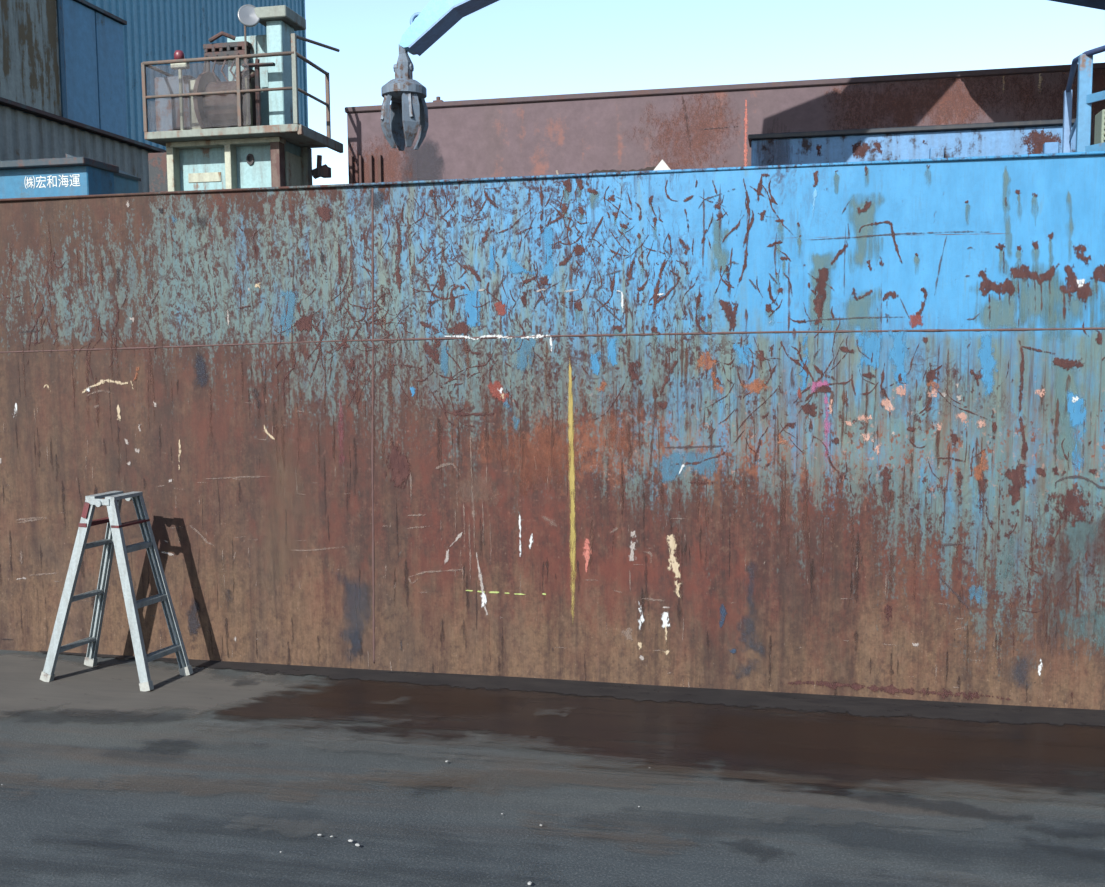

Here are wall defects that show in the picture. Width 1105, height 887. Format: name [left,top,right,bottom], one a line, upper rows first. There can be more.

rust [395,219,416,293]
rust [405,264,481,372]
rust [494,302,506,343]
rust [559,244,584,284]
rust [597,190,772,506]
rust [747,198,928,534]
peeling [881,385,906,411]
rust [907,349,949,440]
peeling [928,384,985,428]
rust [936,357,1097,529]
rust [976,232,1105,344]
peeling [667,535,681,597]